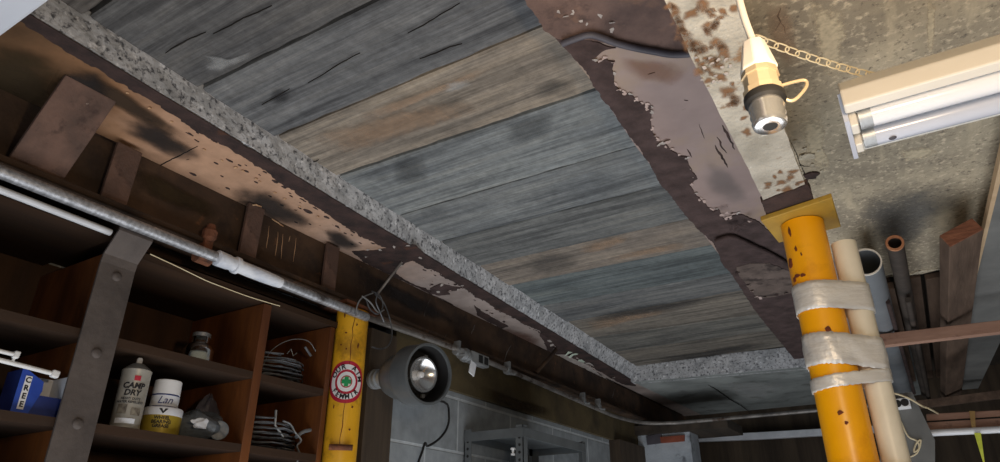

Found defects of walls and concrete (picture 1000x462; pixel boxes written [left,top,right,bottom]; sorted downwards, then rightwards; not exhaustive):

rust [665,0,750,136]
peeling [21,14,682,415]
peeling [525,0,806,359]
rust [765,170,805,192]
spalling [794,140,824,182]